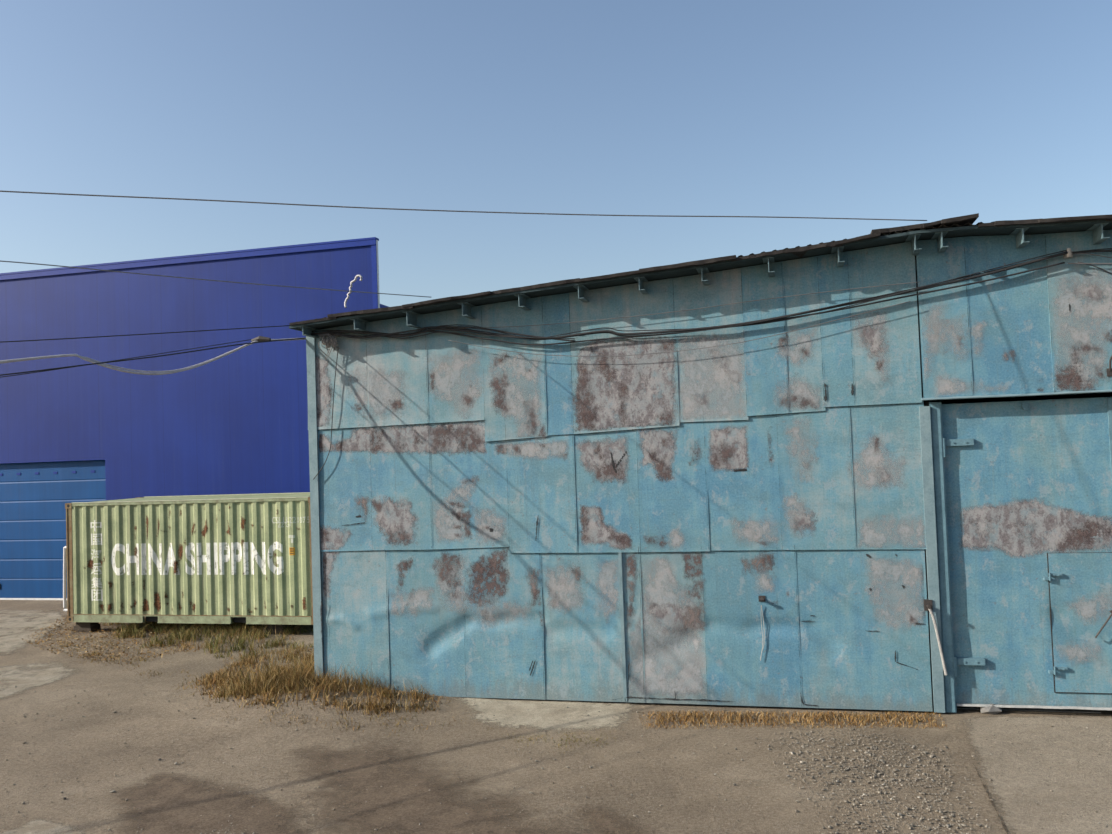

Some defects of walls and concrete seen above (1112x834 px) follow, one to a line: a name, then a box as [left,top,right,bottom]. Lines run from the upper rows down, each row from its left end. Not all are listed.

peeling [1055,272,1112,390]
peeling [316,336,748,482]
peeling [372,497,416,545]
peeling [961,499,1112,557]
peeling [392,558,464,615]
peeling [629,559,705,696]
crack [974,765,1008,834]